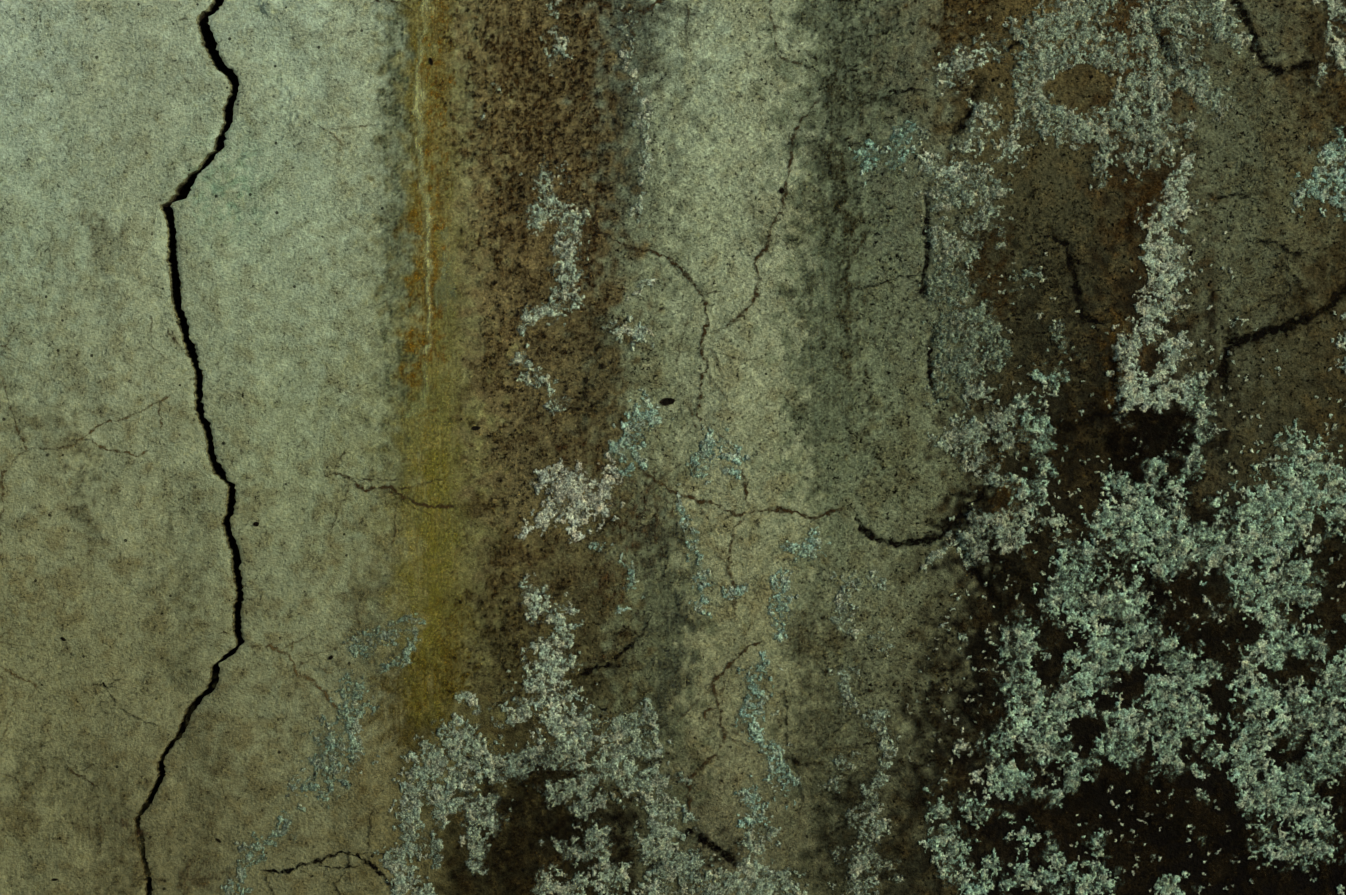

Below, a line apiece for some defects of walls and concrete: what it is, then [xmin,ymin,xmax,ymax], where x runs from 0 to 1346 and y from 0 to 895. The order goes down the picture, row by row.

crack [0,0,361,895]
leakage [375,0,653,551]
rust [373,0,655,747]
leakage [789,0,917,502]
crack [1052,234,1127,431]
leakage [980,169,1241,547]
crack [1150,24,1171,65]
leakage [1214,0,1346,347]
crack [1219,240,1346,386]
crack [1232,0,1338,76]
leakage [448,741,644,895]
leakage [794,488,1346,895]